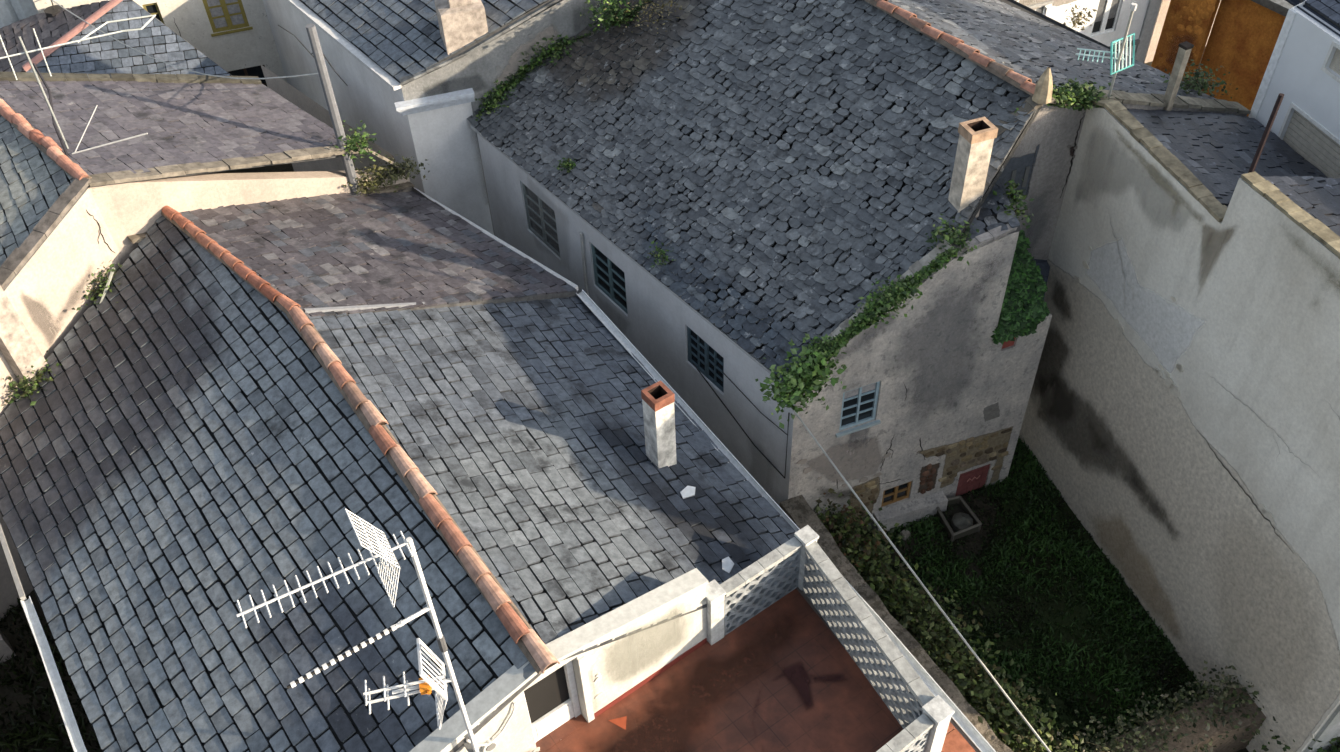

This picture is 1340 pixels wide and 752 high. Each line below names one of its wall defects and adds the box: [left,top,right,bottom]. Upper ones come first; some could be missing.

crack [86,210,115,253]
water stain [1032,331,1172,532]
flaking render [1019,259,1340,752]
water stain [600,613,793,752]
water stain [783,663,844,708]